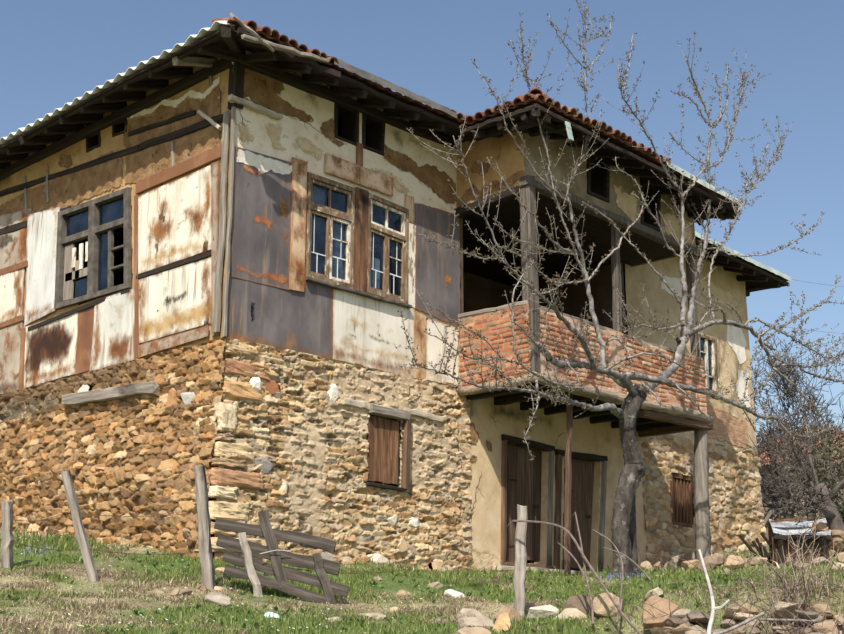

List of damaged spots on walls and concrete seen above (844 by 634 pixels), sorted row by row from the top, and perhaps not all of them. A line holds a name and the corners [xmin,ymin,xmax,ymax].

spalling [244,68,348,147]
spalling [0,77,221,216]
peeling [236,121,323,175]
spalling [375,144,525,208]
corrosion [0,211,28,260]
corrosion [152,201,172,240]
corrosion [189,183,210,228]
corrosion [3,274,23,318]
corrosion [139,268,211,336]
corrosion [236,263,305,286]
corrosion [26,324,72,384]
corrosion [93,326,143,365]